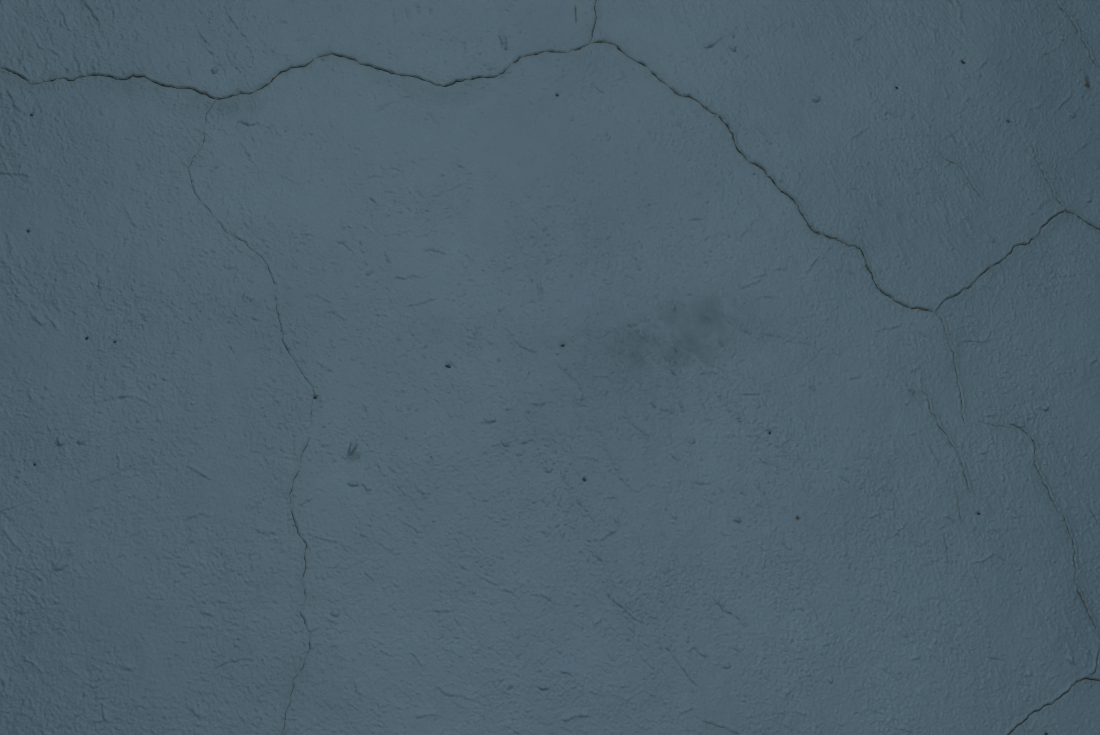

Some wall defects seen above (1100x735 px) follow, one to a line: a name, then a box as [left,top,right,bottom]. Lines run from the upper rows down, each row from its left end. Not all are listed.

crack [1,0,1100,424]
crack [282,439,310,732]
crack [985,423,1096,628]
crack [1008,651,1100,735]